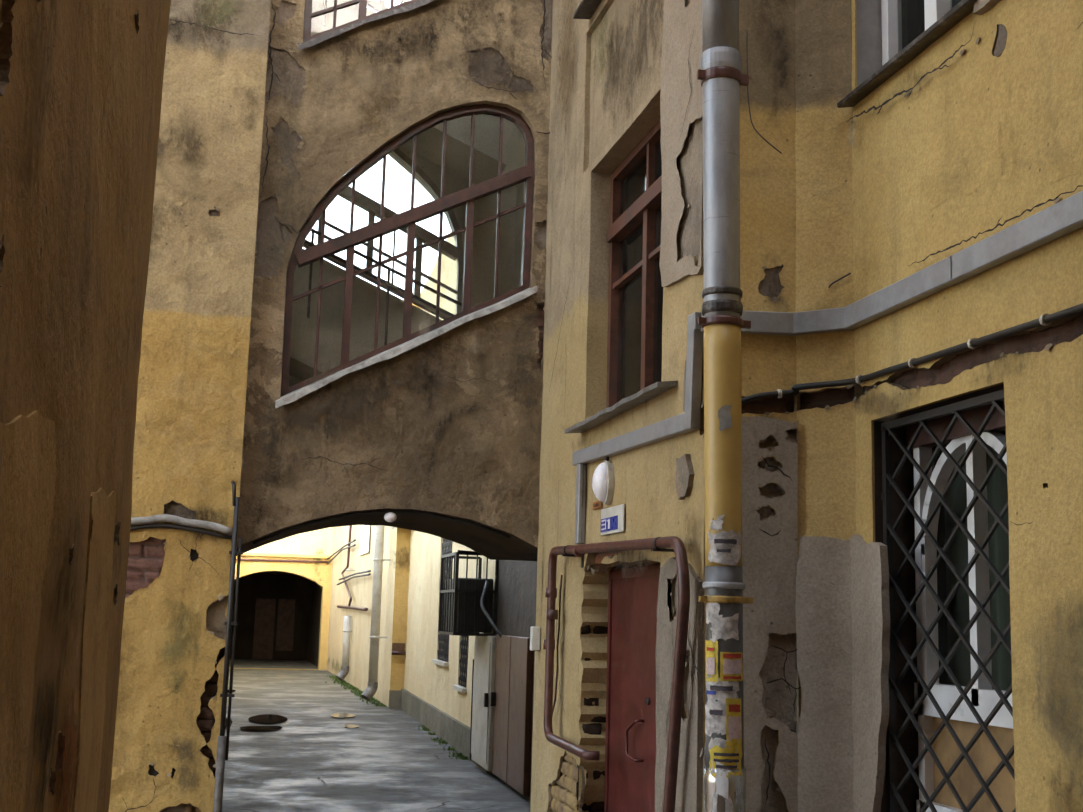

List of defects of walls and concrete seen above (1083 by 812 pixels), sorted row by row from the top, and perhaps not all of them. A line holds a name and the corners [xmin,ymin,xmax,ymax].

spalling [0,0,15,96]
flaking render [265,47,308,108]
crack [847,19,980,124]
crack [910,185,1083,266]
spalling [758,264,784,303]
spalling [163,500,197,520]
flaking render [741,312,1083,812]
peeling [48,488,167,812]
flaking render [196,595,229,778]
flaking render [582,698,606,735]
flaking render [159,803,201,812]
flaking render [547,750,605,812]